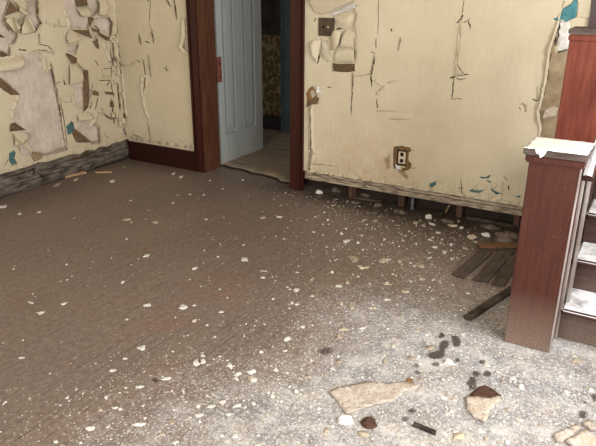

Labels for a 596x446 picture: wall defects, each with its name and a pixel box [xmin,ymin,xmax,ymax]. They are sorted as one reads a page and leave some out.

peeling [0,0,152,165]
peeling [309,0,359,72]
crack [351,42,410,120]
crack [450,2,471,100]
flaking render [524,0,595,158]
peeling [306,86,520,205]